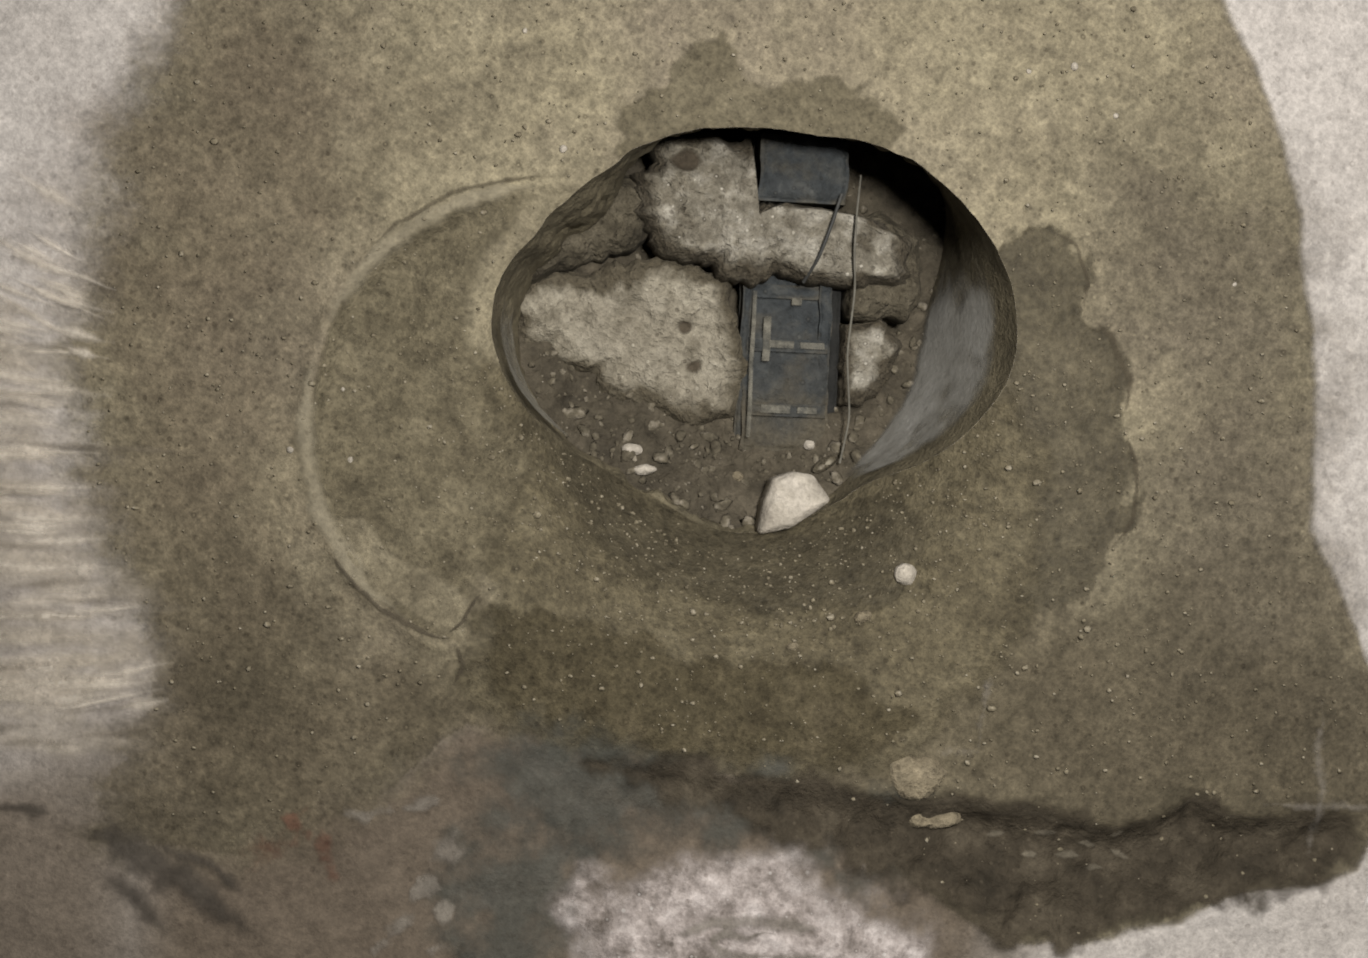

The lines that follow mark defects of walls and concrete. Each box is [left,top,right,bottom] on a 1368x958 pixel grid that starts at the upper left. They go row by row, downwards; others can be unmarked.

water stain [617,34,903,156]
hole [491,127,764,533]
efflorescence [0,484,141,707]
water stain [201,639,327,799]
water stain [704,755,906,804]
water stain [911,646,1342,834]
water stain [1148,400,1368,881]
water stain [440,847,924,958]
water stain [1082,902,1211,943]